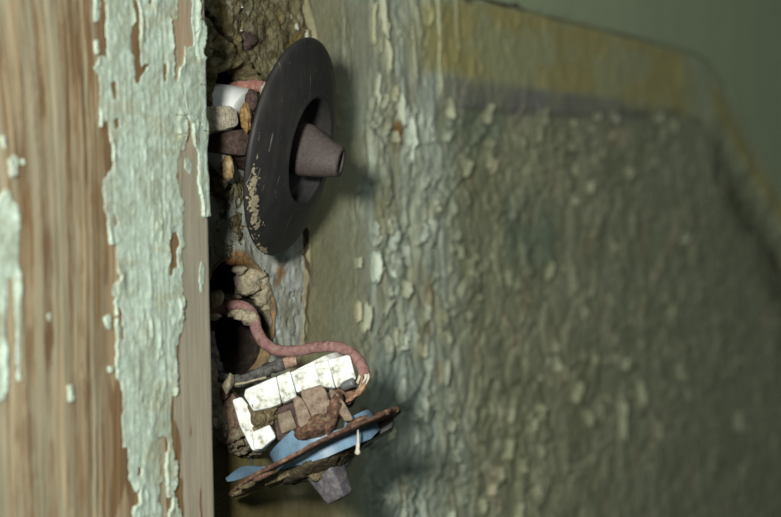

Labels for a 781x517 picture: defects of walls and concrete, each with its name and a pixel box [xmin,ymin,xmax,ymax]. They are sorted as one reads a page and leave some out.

peeling [367,0,453,165]
peeling [443,97,455,119]
peeling [481,103,495,124]
peeling [1,135,25,177]
peeling [418,200,442,243]
peeling [93,0,312,517]
peeling [0,190,23,401]
peeling [355,218,413,356]
peeling [422,300,452,344]
peeling [67,384,75,402]
peeling [366,367,375,390]
peeling [395,360,456,445]